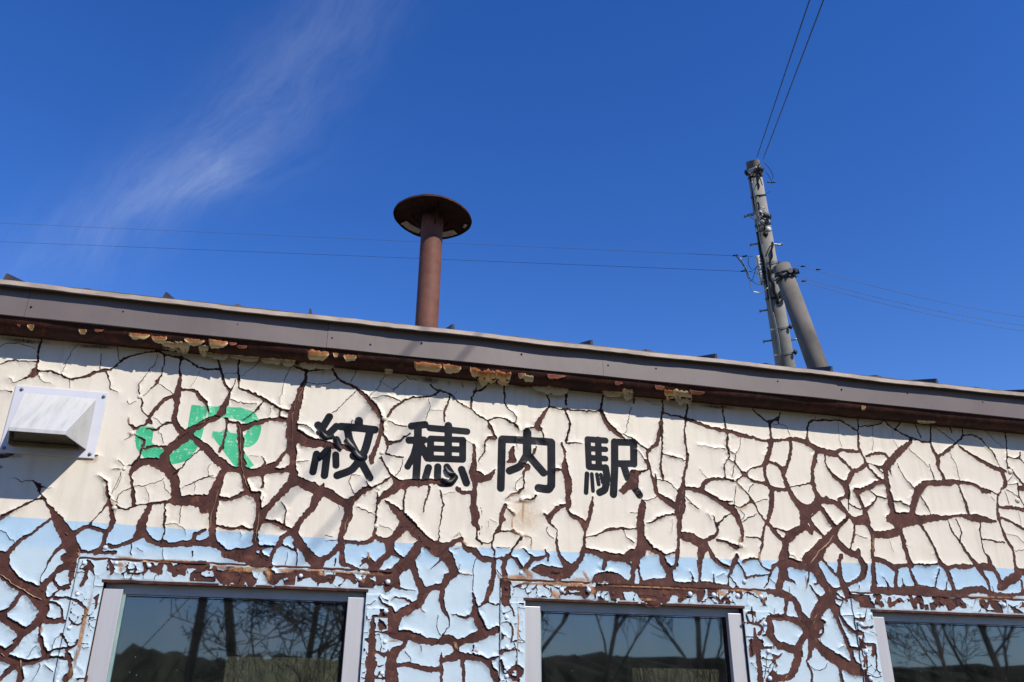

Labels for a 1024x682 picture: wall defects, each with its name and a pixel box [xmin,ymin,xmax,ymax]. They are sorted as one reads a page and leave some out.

peeling [129,333,356,370]
peeling [414,361,569,395]
peeling [602,381,633,401]
peeling [655,385,705,406]
peeling [506,446,517,463]
peeling [619,468,649,495]
crack [0,337,1024,682]
corrosion [498,570,595,598]
peeling [106,547,400,682]
peeling [500,564,772,682]
peeling [853,594,1024,614]